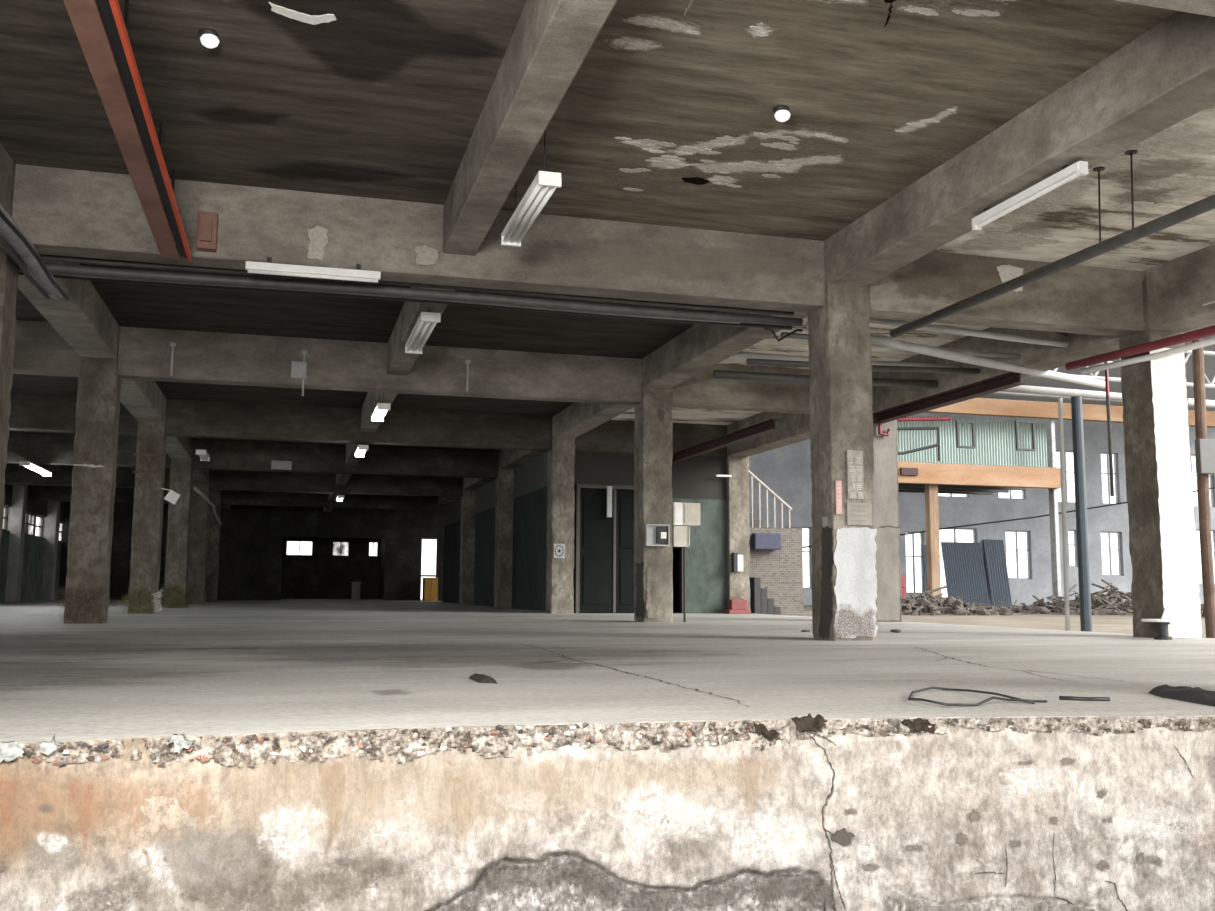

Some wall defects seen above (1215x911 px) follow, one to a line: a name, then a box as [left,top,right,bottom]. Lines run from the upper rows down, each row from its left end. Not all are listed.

peeling [613,15,700,50]
peeling [748,23,773,37]
peeling [611,123,862,193]
spalling [0,717,1215,768]
crack [803,730,855,911]
spalling [435,853,833,911]
spalling [1138,853,1163,877]